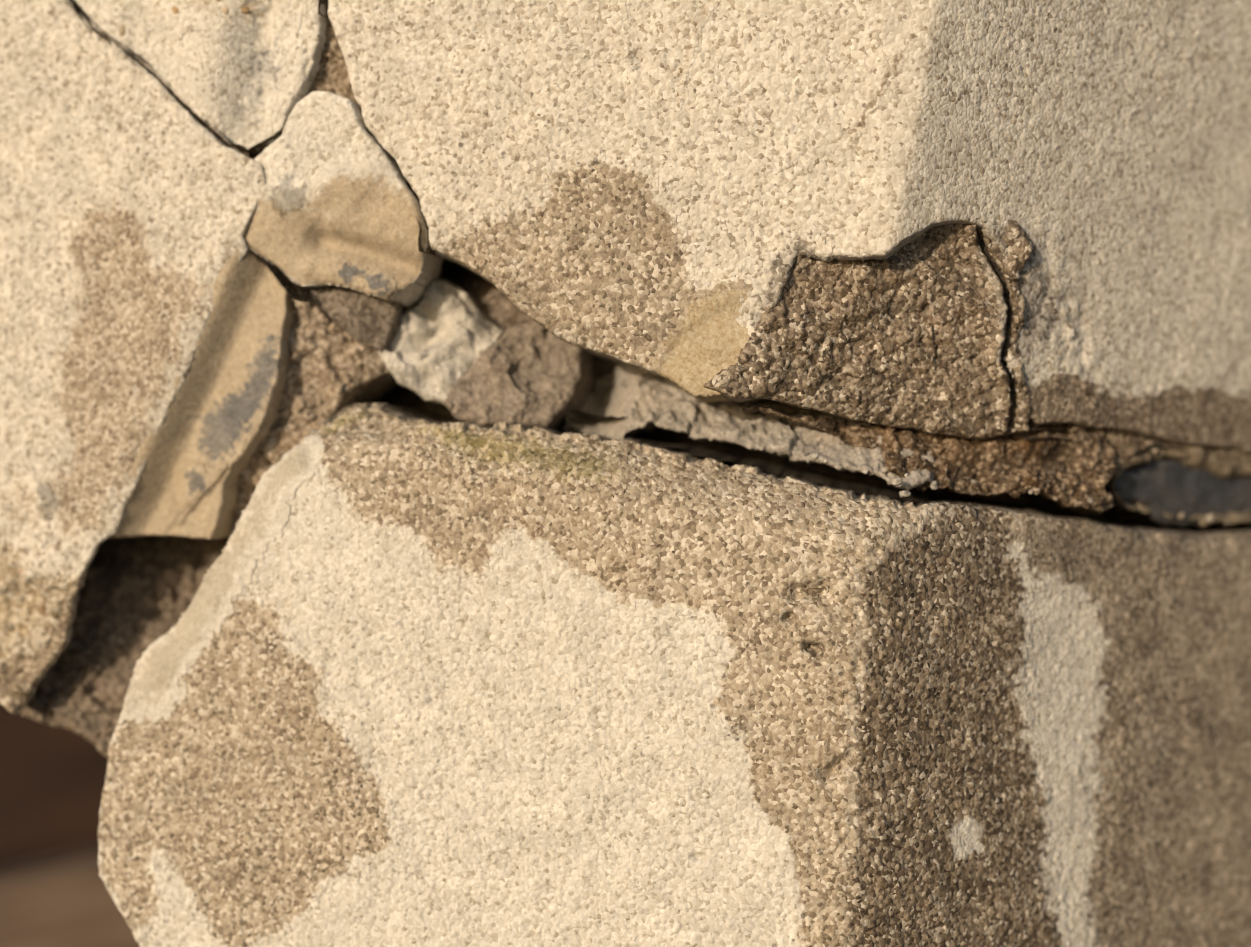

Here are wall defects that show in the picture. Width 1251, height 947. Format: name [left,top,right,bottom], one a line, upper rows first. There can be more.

crack [64,0,283,160]
crack [307,0,436,255]
crack [248,243,308,302]
leakage [434,150,834,403]
spalling [703,220,1034,439]
crack [972,226,1251,461]
leakage [977,210,1251,453]
spalling [0,274,397,758]
crack [562,410,1218,529]
leakage [98,588,400,947]
leakage [314,404,1251,947]
spalling [804,642,824,656]